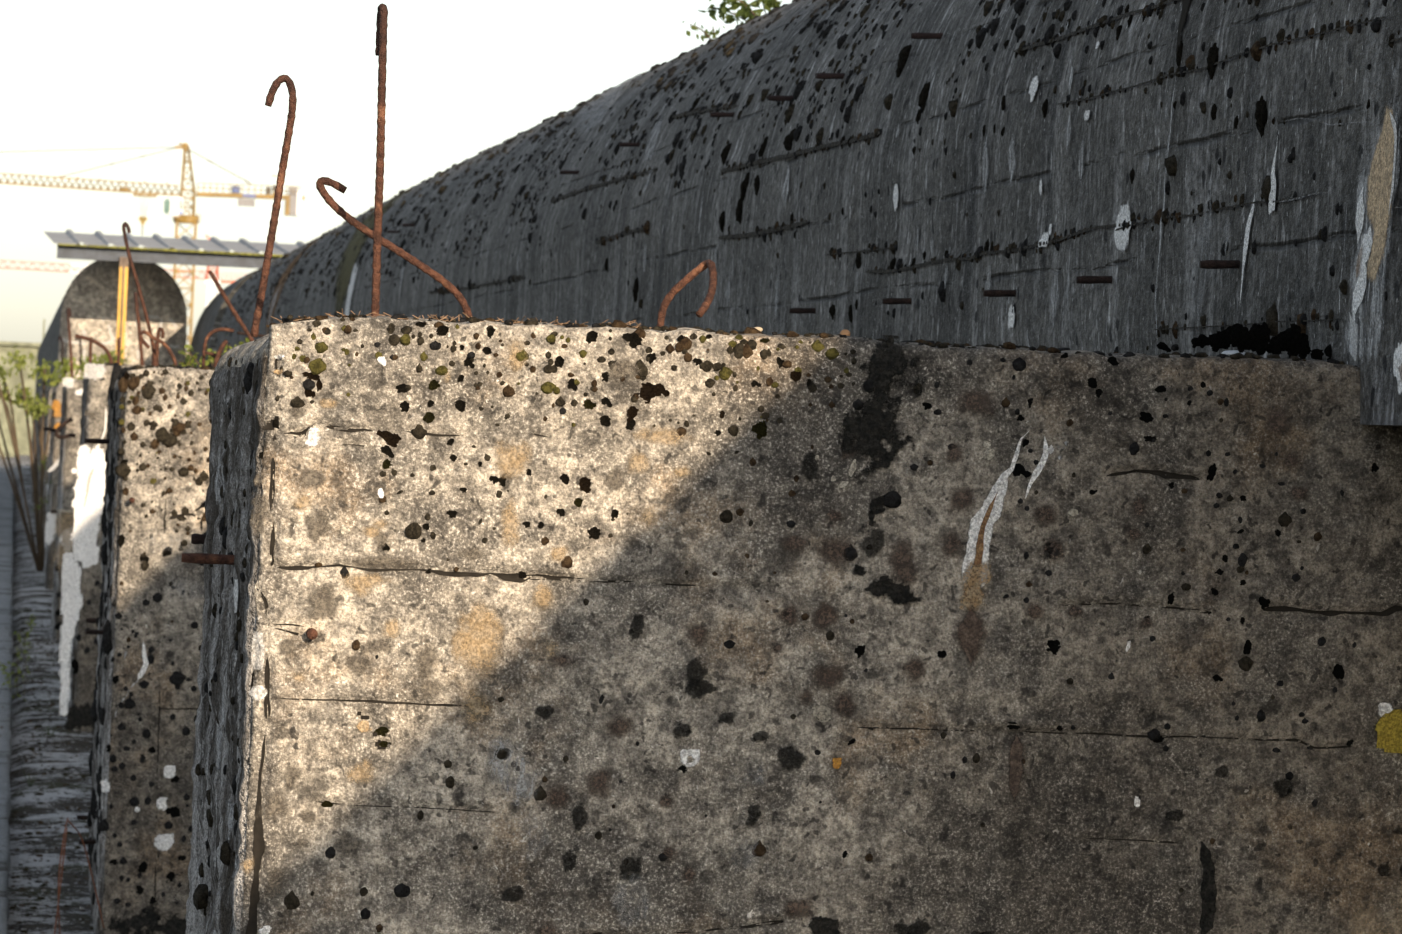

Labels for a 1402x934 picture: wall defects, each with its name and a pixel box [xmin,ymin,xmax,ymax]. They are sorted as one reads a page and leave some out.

efflorescence [1393,342,1402,394]
leakage [45,410,107,716]
leakage [956,431,1067,667]